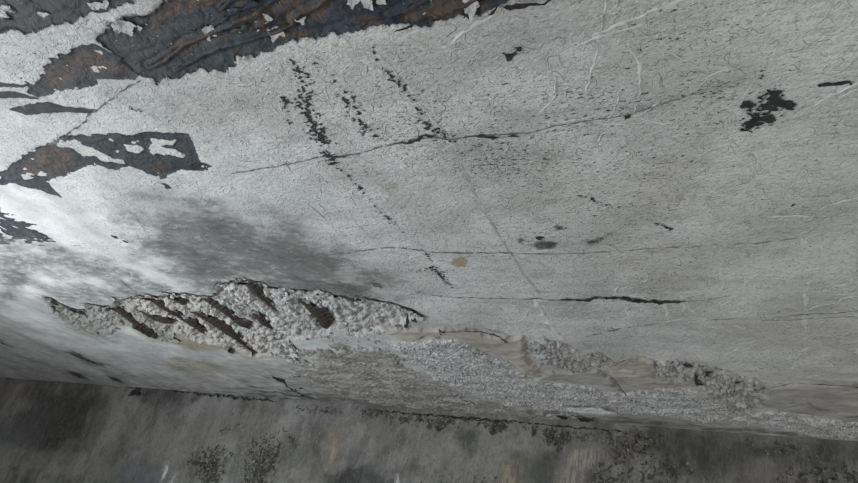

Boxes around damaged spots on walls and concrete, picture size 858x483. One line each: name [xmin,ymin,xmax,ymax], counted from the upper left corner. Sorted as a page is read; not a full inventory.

peeling [0,0,551,115]
crack [231,79,742,174]
peeling [740,91,796,129]
peeling [0,131,212,198]
peeling [0,213,54,246]
crack [331,247,526,255]
spalling [41,278,858,439]